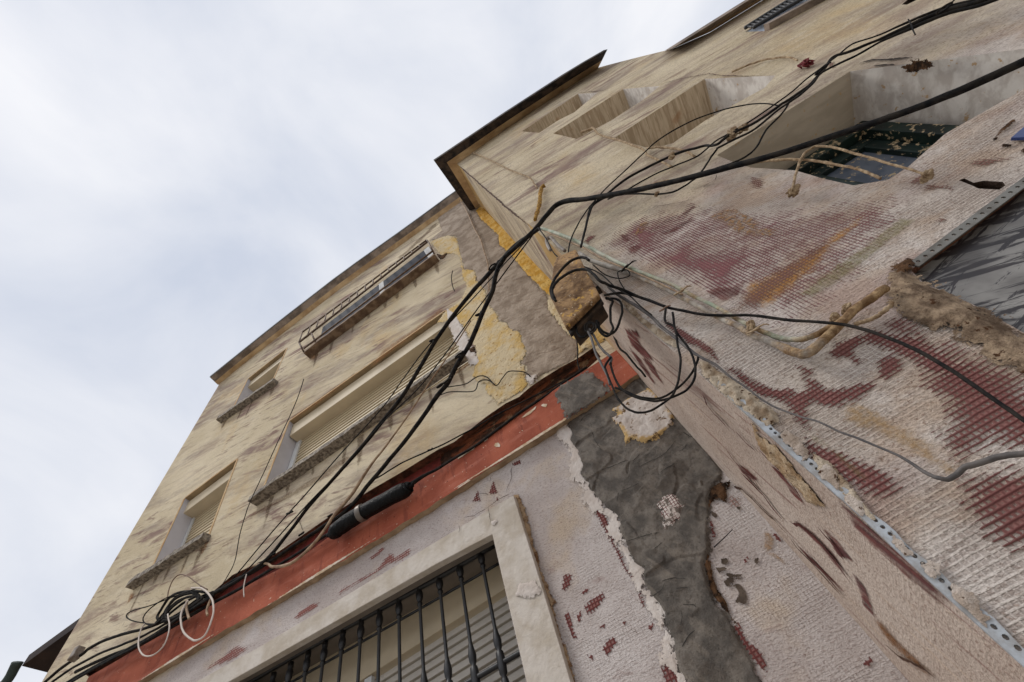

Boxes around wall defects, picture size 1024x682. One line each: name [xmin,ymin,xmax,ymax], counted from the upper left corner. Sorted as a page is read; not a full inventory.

flaking render [901,57,933,73]
flaking render [971,119,1024,167]
flaking render [891,258,915,272]
peeling [431,206,686,682]
peeling [268,538,411,605]
flaking render [704,554,736,624]
flaking render [888,532,942,578]
peeling [141,634,214,680]